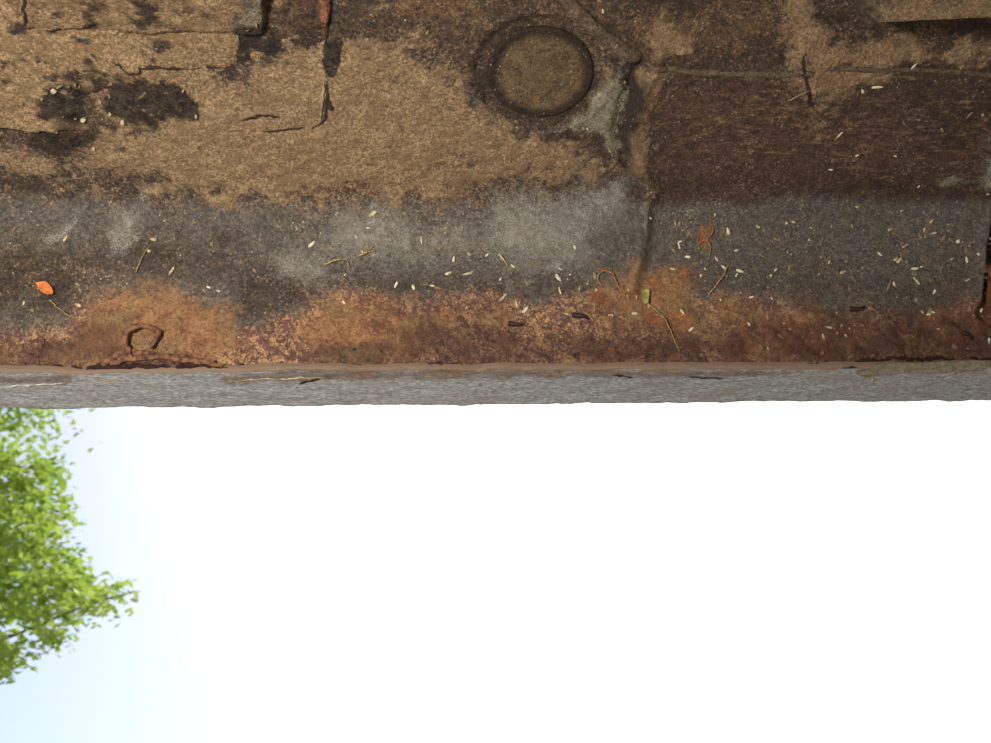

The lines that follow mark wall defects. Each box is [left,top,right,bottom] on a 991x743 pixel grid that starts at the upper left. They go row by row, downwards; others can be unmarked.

crack [20,0,28,29]
corrosion [319,0,330,34]
crack [242,79,334,133]
crack [789,52,814,108]
water stain [42,207,86,246]
water stain [104,192,150,256]
water stain [279,194,424,286]
water stain [479,171,649,288]
corrosion [301,297,452,375]
corrosion [590,259,888,363]
corrosion [913,266,991,359]